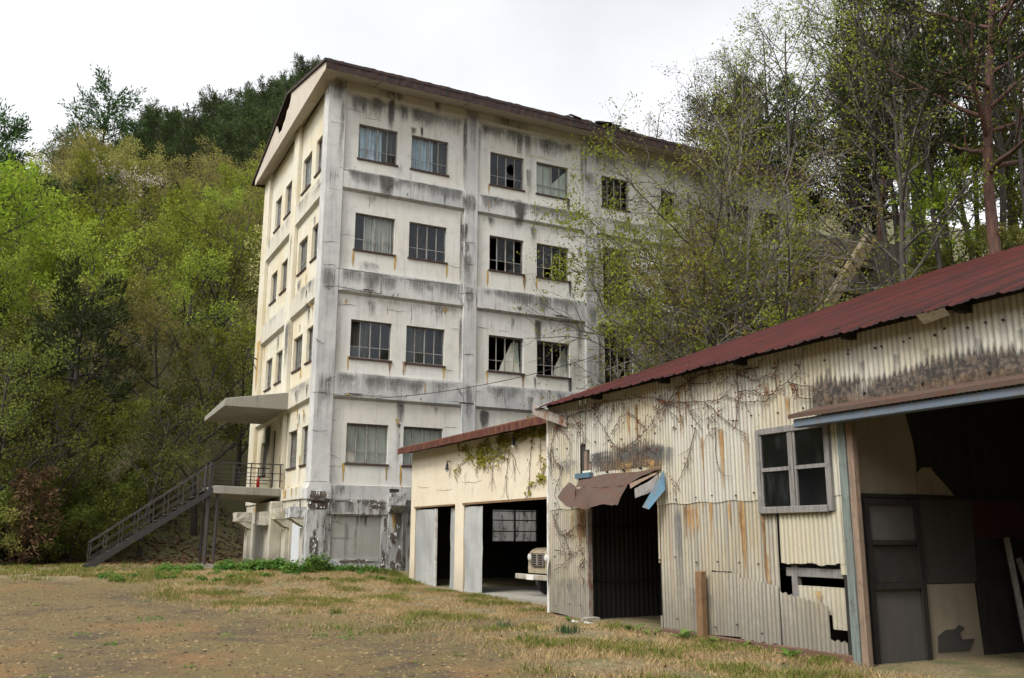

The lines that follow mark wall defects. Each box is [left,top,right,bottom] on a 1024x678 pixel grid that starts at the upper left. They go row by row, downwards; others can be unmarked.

leakage [354,92,440,135]
leakage [808,344,1024,409]
leakage [591,440,672,472]
rust [627,405,638,443]
peeling [285,488,402,570]
rust [684,502,712,537]
rust [728,500,746,565]
rust [761,514,771,584]